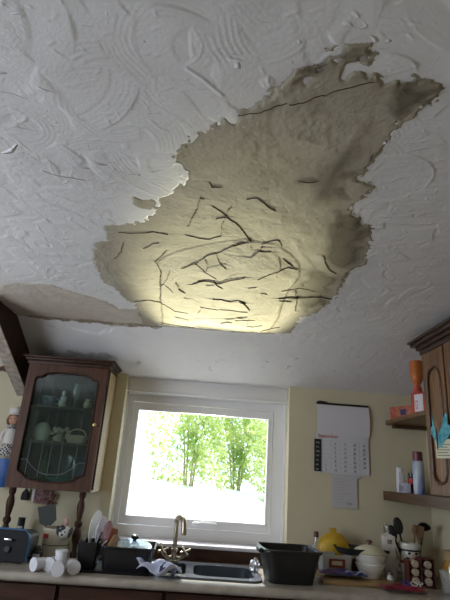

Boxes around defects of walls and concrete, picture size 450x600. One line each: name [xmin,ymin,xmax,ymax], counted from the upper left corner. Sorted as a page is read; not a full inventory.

crack [238,82,374,116]
spalling [0,42,444,333]
crack [114,183,338,332]
water stain [328,217,363,268]
water stain [294,271,335,309]